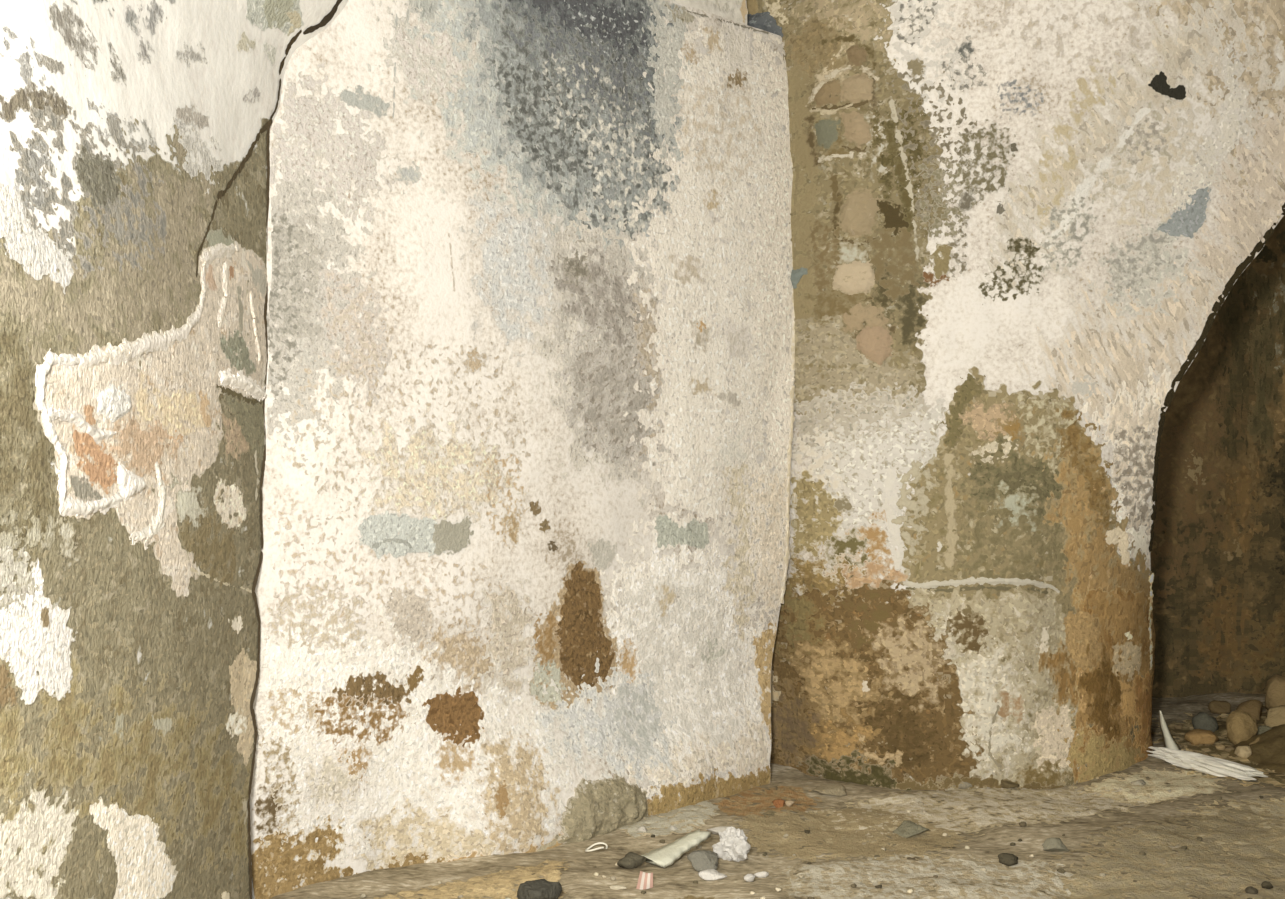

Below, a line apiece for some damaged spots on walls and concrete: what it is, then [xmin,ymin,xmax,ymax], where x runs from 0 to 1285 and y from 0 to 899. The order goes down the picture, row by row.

spalling [236,0,304,68]
crack [391,1,399,118]
crack [447,233,455,292]
crack [190,0,342,899]
corrosion [267,336,558,634]
crack [1149,203,1285,552]
corrosion [508,558,643,710]
water stain [1038,625,1050,659]